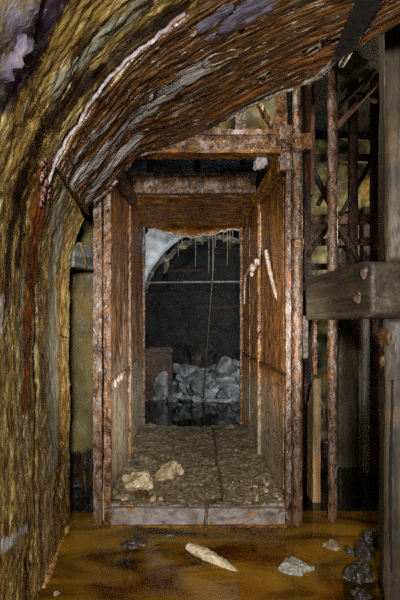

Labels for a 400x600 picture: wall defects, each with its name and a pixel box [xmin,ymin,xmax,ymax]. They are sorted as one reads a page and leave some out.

leakage [0,0,191,187]
leakage [42,61,214,475]
corrosion [4,0,400,414]